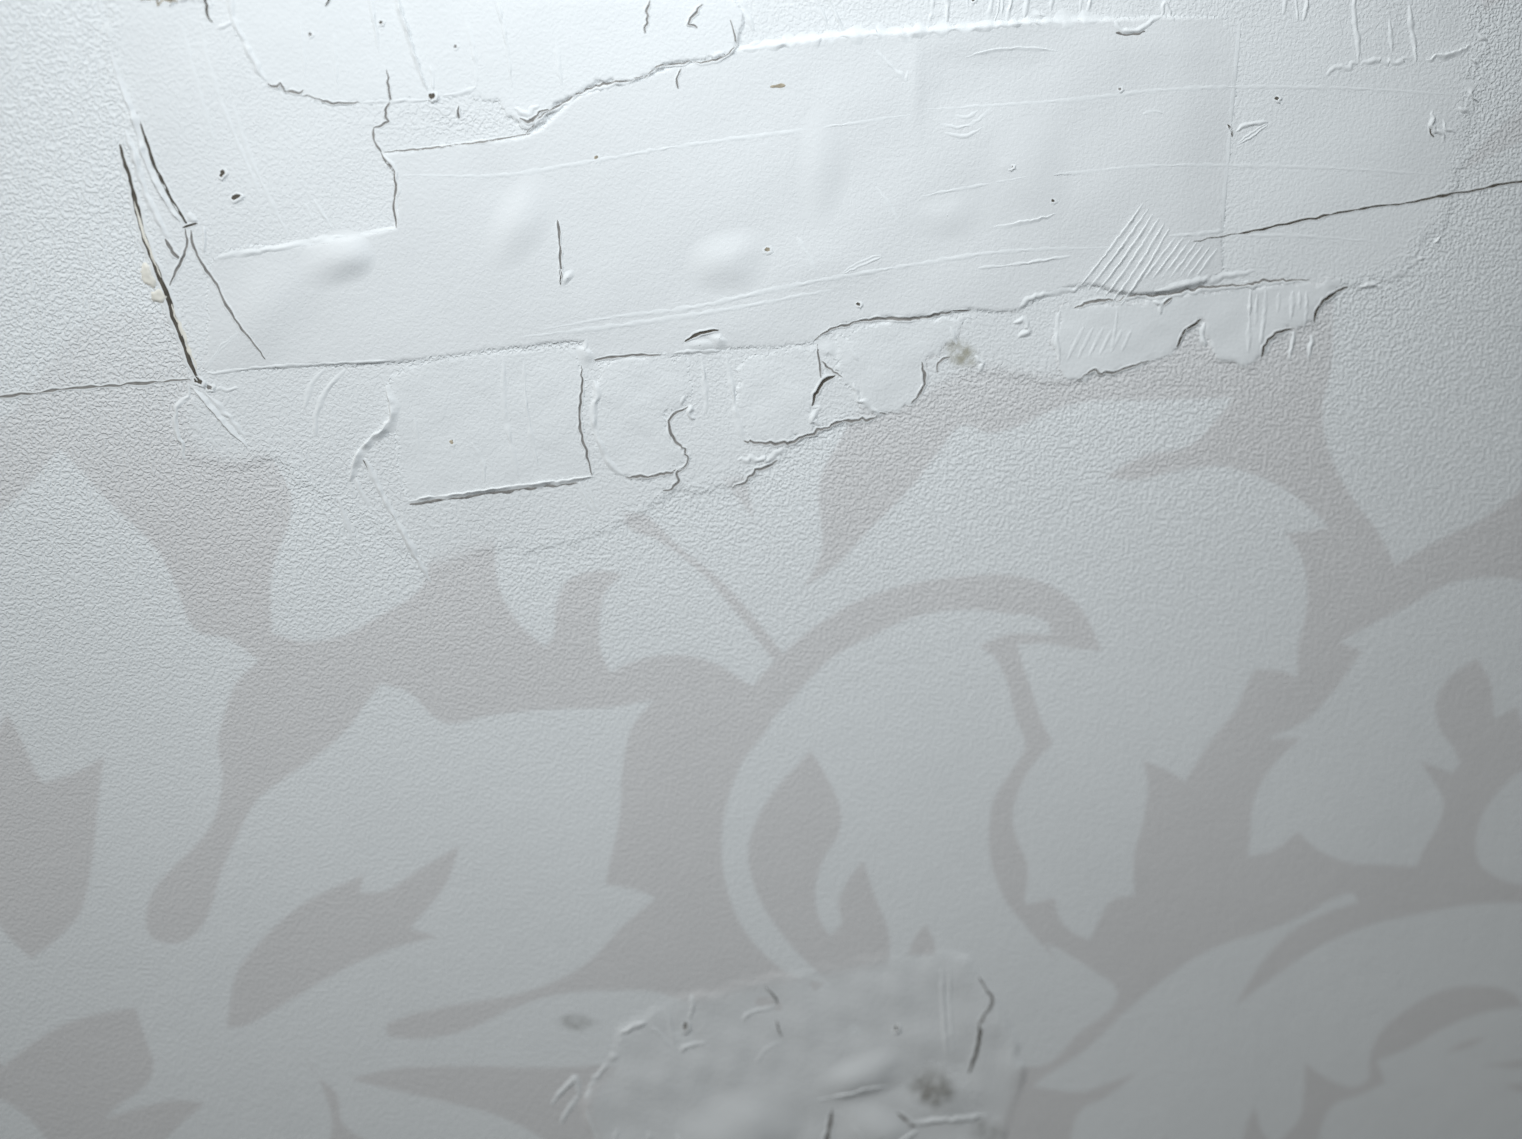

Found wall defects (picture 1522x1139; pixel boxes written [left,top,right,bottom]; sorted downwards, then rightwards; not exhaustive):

crack [0,54,393,400]
spalling [217,167,246,205]
crack [360,69,531,236]
spalling [555,220,575,286]
peeling [140,0,1175,135]
spalling [993,198,1058,230]
peeling [1013,233,1444,384]
flaking render [1227,119,1268,145]
crack [1193,179,1522,242]
flaking render [1427,58,1479,143]
peeling [387,328,728,502]
flaking render [731,301,970,488]